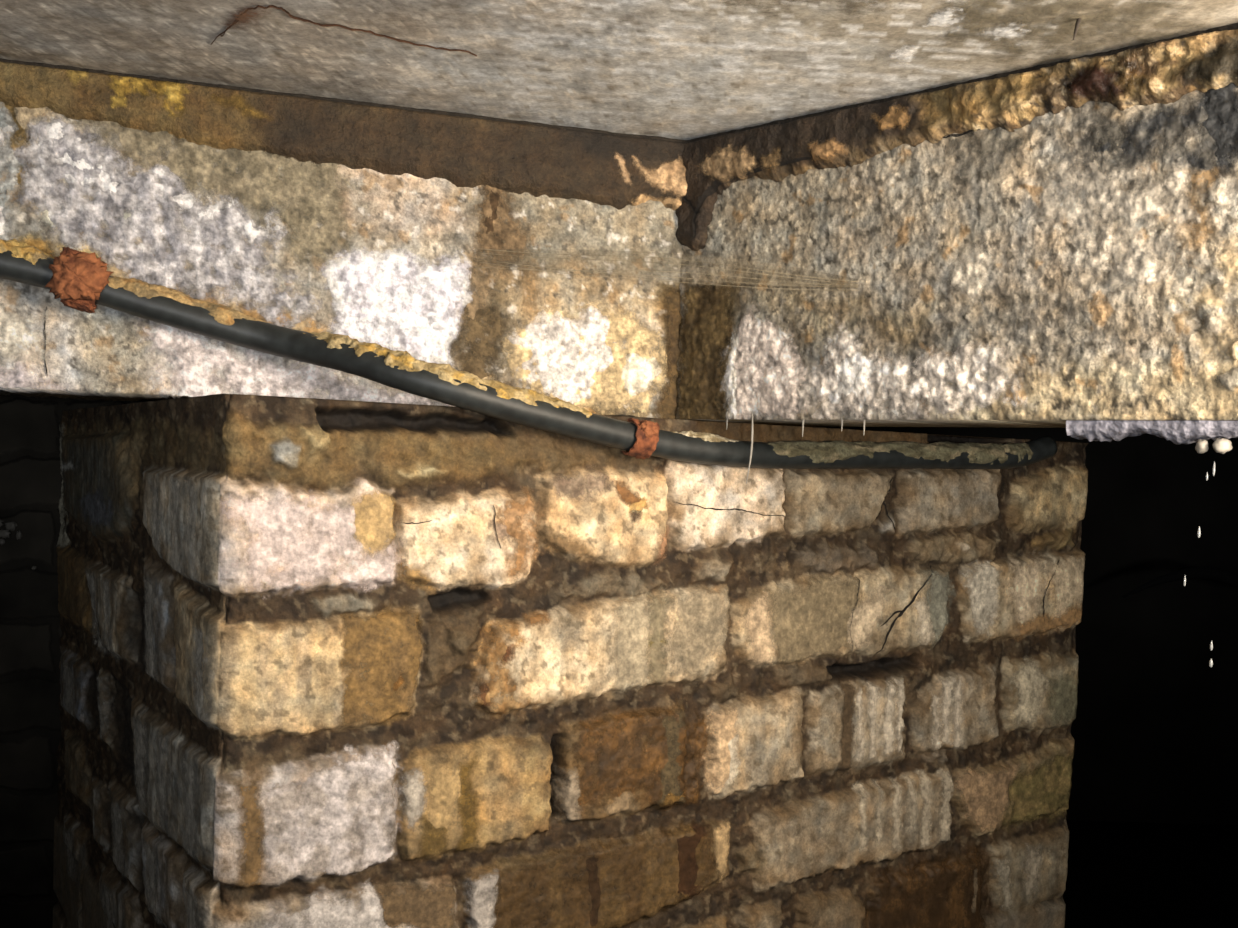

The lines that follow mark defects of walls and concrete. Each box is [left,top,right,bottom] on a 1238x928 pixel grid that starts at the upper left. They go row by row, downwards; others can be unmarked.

water stain [891,46,919,62]
water stain [923,0,1200,60]
peeling [873,106,909,130]
peeling [616,155,687,211]
peeling [701,145,779,181]
peeling [808,139,844,163]
water stain [1039,37,1238,285]
crack [849,565,933,655]